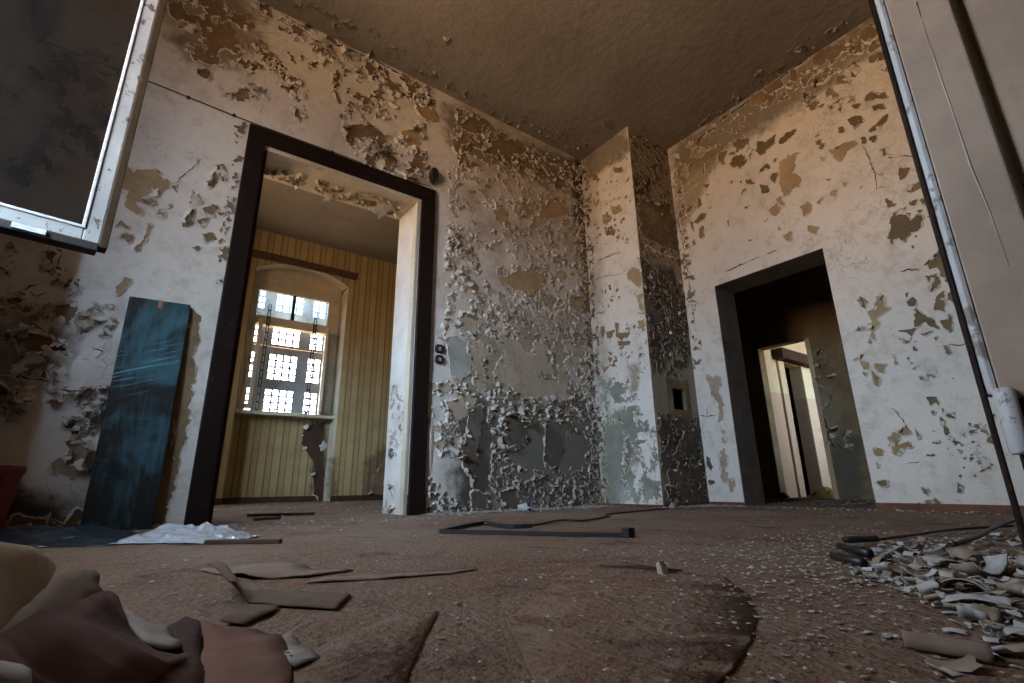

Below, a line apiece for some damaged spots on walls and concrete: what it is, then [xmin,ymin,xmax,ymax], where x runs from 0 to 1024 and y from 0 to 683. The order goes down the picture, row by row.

peeling [113,121,249,263]
crack [173,158,202,193]
crack [862,145,912,194]
peeling [166,0,929,514]
peeling [0,242,134,480]
peeling [852,237,960,388]
peeling [871,396,996,494]
peeling [4,506,83,528]
peeling [918,486,944,504]